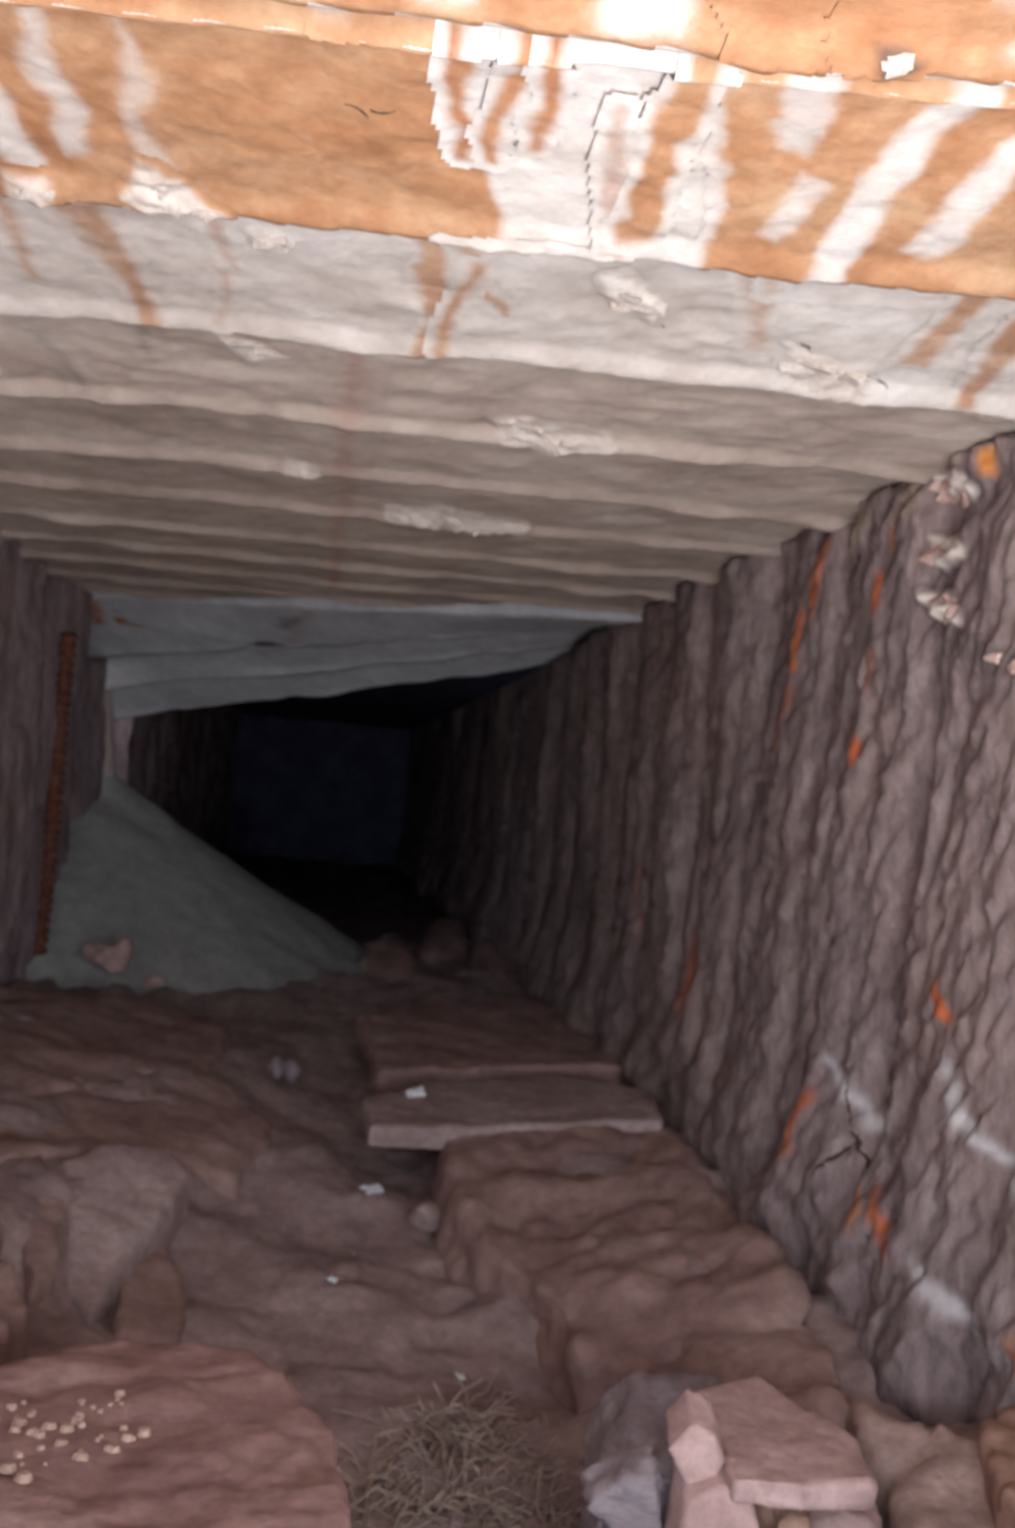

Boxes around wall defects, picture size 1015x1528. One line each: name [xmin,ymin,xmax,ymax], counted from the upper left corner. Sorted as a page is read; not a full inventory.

rust [0,0,1015,416]
rust [770,530,844,759]
rust [845,517,898,779]